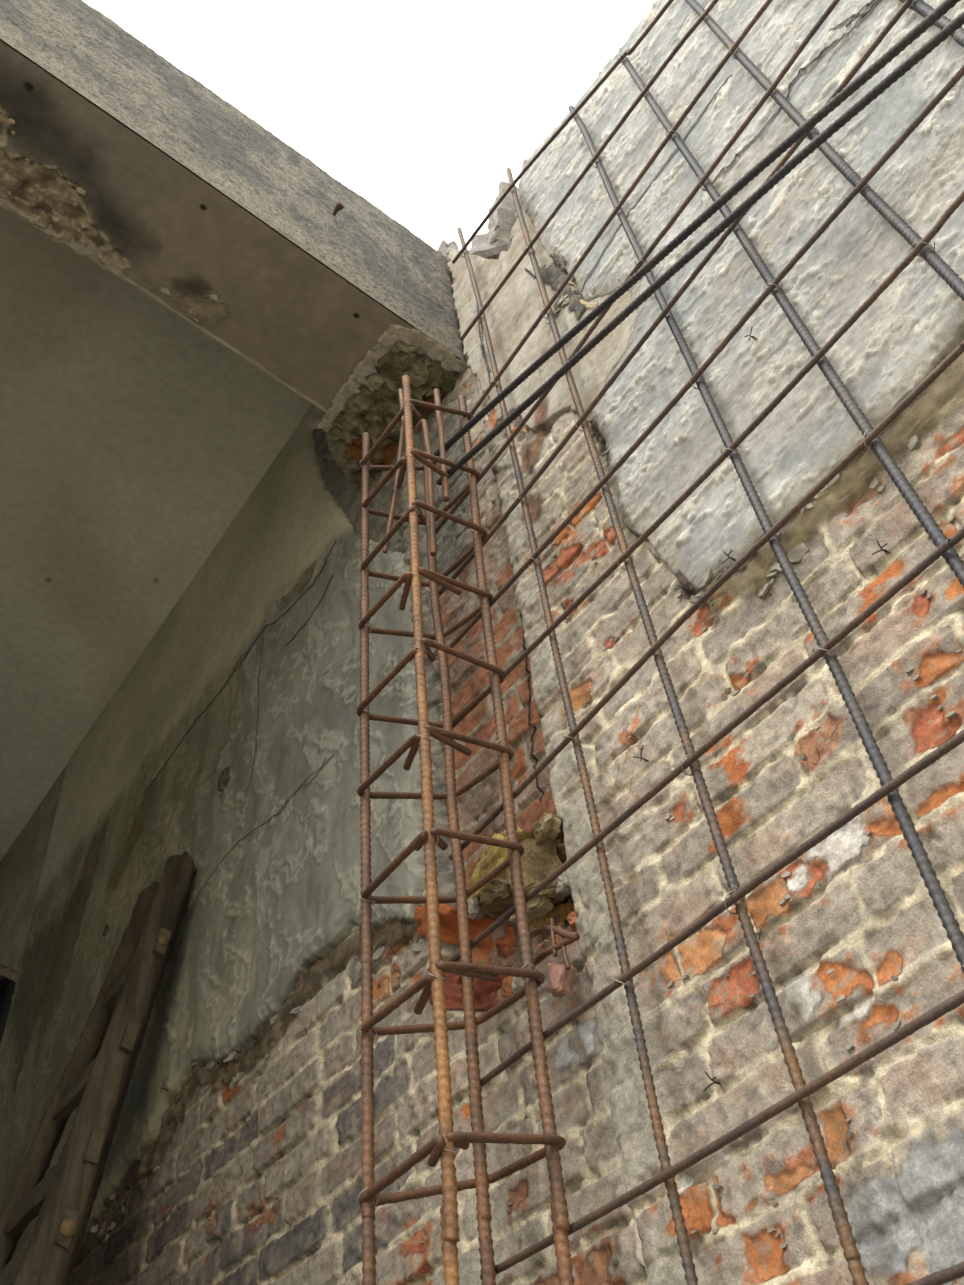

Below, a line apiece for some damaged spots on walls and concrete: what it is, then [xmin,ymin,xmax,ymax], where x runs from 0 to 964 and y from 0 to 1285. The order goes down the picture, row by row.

spalling [0,107,131,271]
water stain [0,75,140,248]
crack [712,0,880,184]
spalling [316,323,469,493]
crack [140,541,337,798]
crack [519,614,544,802]
spalling [436,0,964,1285]
crack [194,755,334,901]
flaking render [90,904,428,1248]
spalling [398,1228,432,1285]